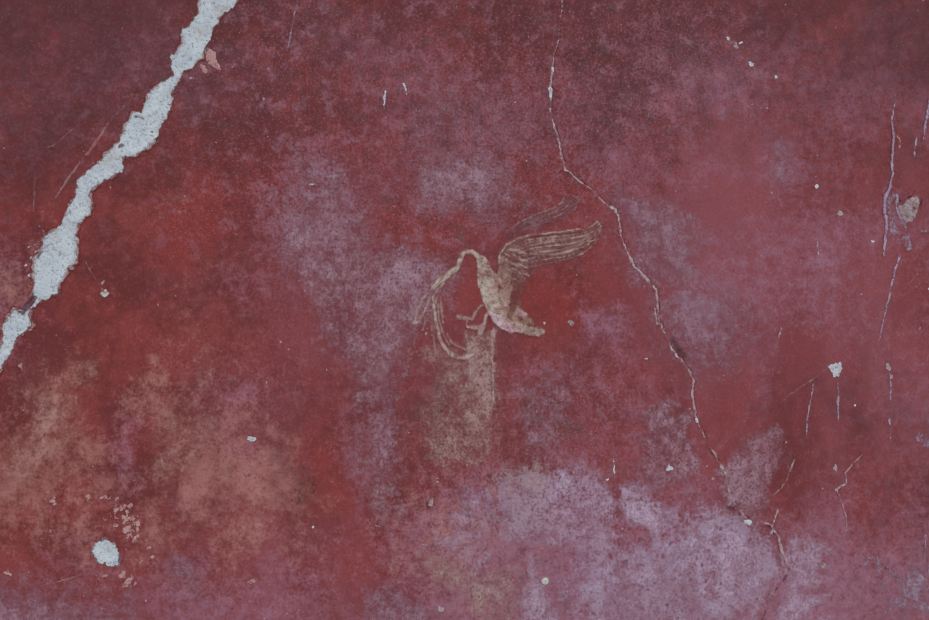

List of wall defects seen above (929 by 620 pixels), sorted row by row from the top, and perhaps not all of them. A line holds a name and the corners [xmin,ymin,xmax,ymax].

crack [18,296,40,315]
crack [548,40,792,597]
crack [875,101,929,439]
spalling [828,362,843,378]
spalling [85,494,155,589]